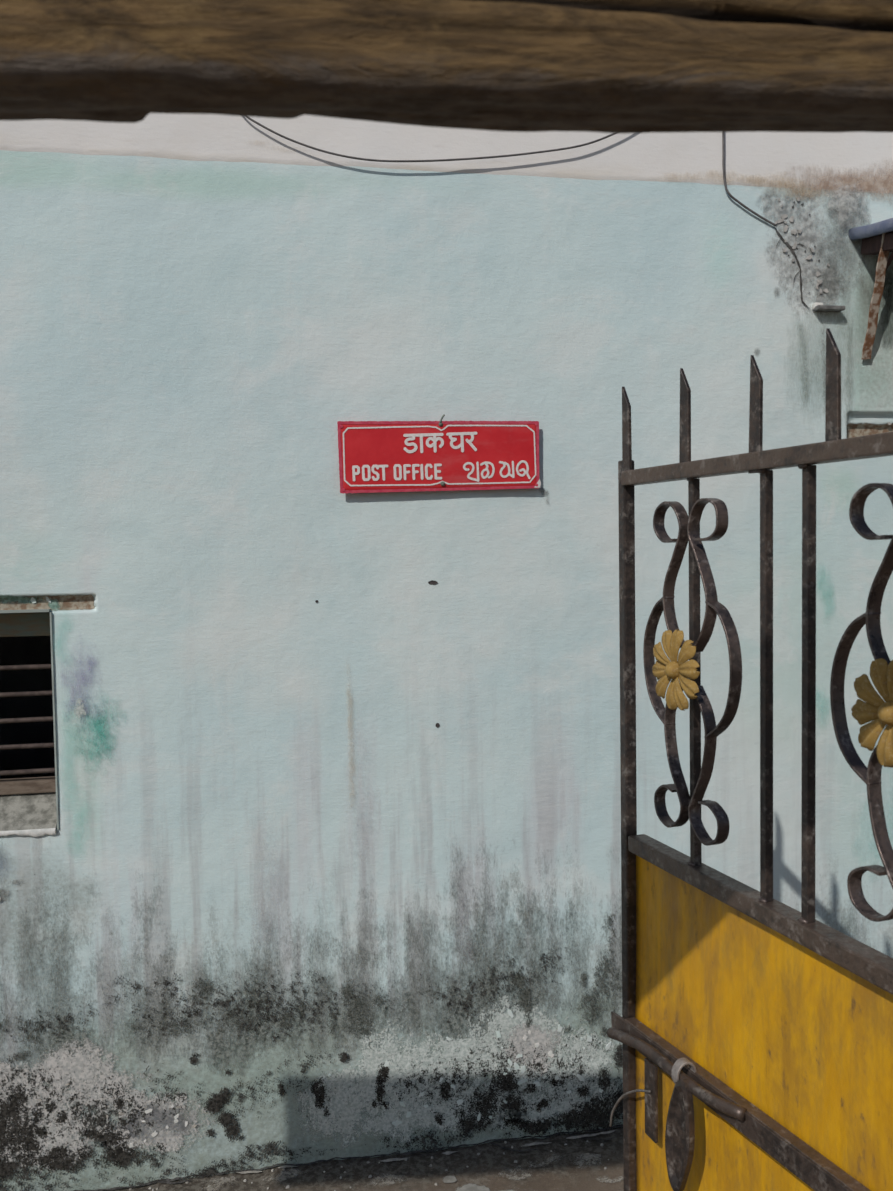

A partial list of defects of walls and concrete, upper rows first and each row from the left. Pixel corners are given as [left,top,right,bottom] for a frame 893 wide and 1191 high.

water stain [0,896,623,1191]